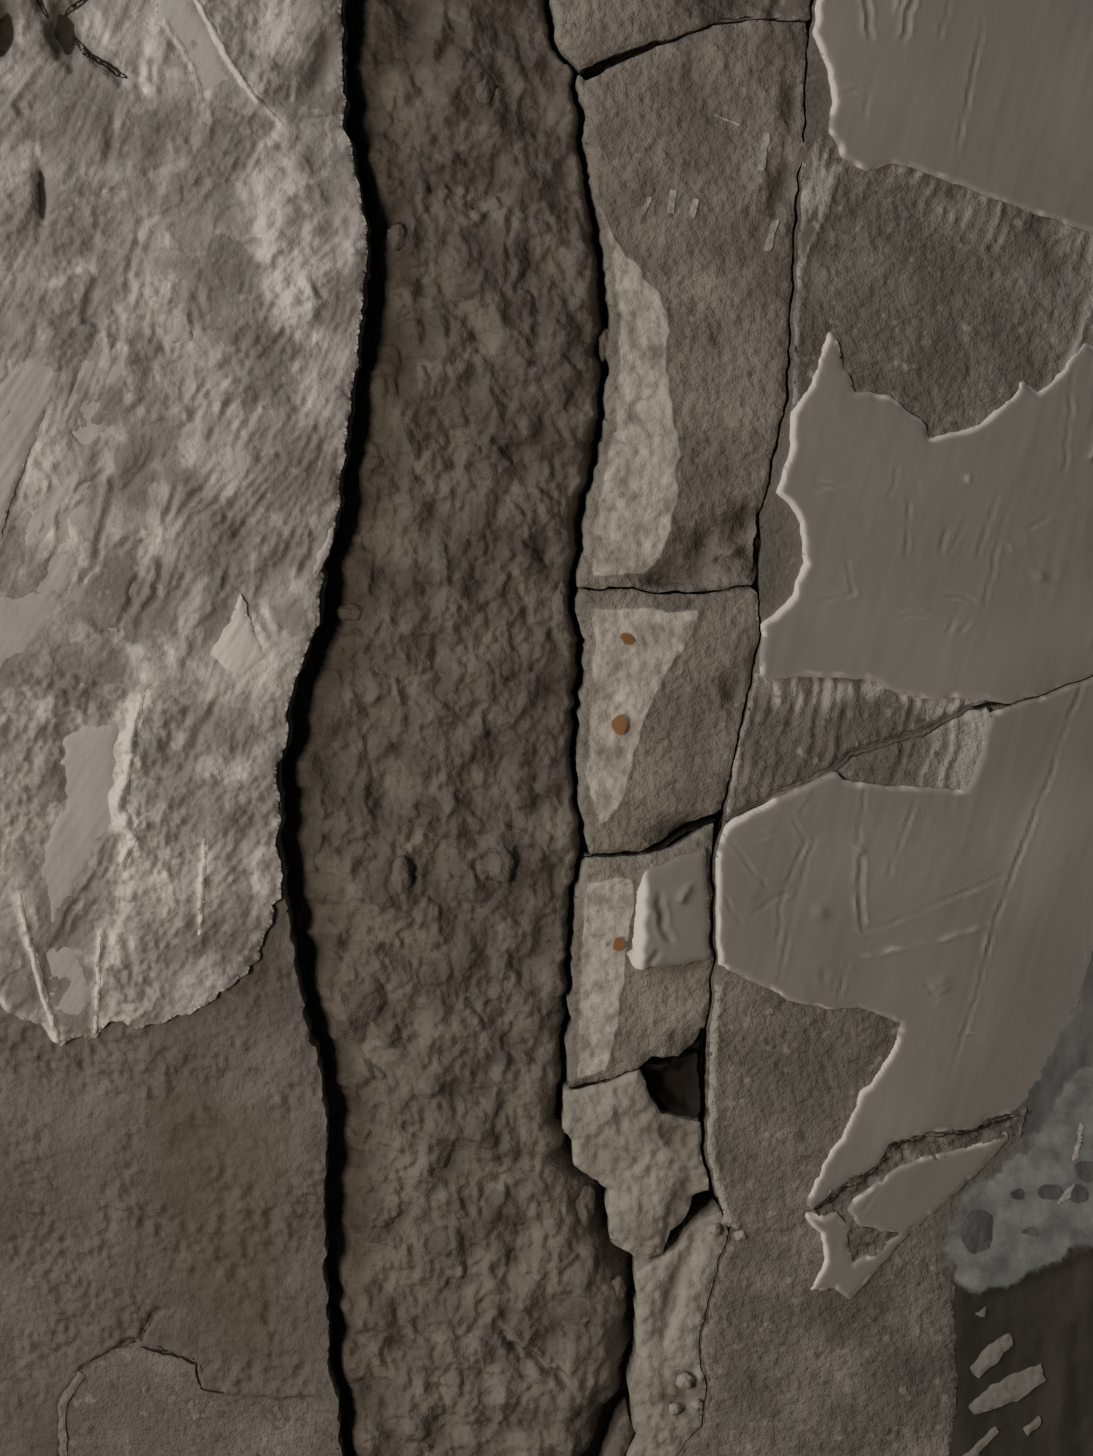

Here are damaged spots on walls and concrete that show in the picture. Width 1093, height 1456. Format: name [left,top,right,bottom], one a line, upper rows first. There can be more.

spalling [0,14,13,57]
spalling [36,0,127,79]
peeling [791,130,1093,438]
peeling [210,594,265,675]
corrosion [621,633,634,645]
crack [569,0,1093,1204]
corrosion [612,714,627,735]
peeling [726,673,990,817]
peeling [41,724,119,922]
corrosion [613,937,625,951]
crack [92,1309,224,1394]
leakage [949,1245,1093,1456]